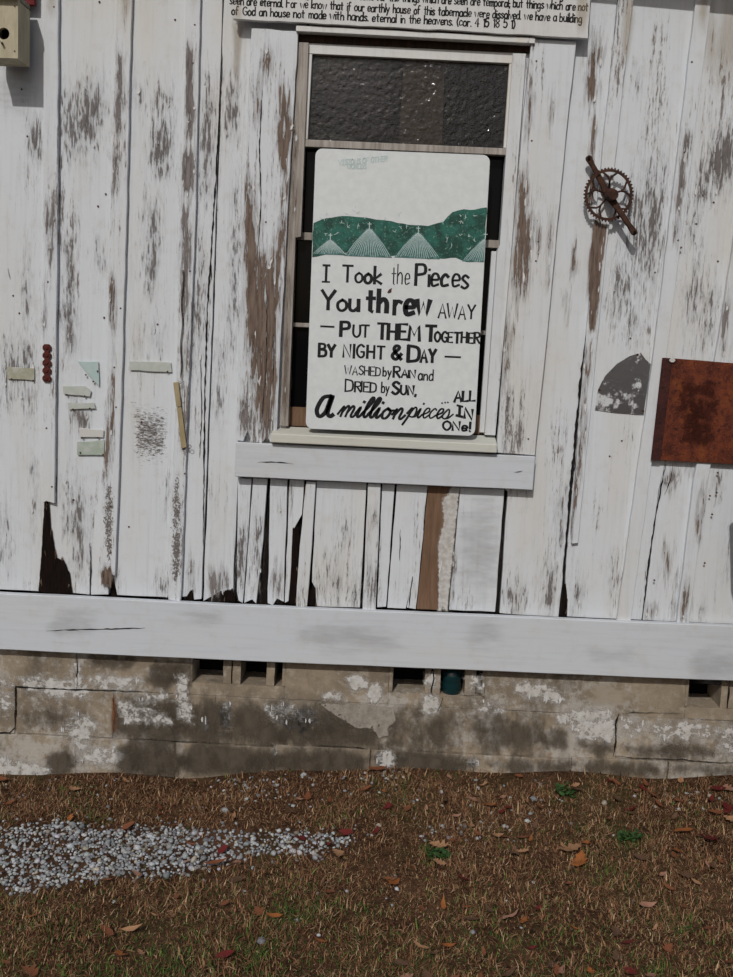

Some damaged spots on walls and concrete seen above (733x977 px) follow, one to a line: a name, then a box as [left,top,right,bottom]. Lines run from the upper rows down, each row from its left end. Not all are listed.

peeling [59,54,125,169]
peeling [586,43,602,102]
peeling [137,41,240,372]
peeling [218,84,297,440]
peeling [510,171,552,301]
peeling [556,125,733,547]
rust [651,358,733,464]
peeling [102,373,115,577]
peeling [155,472,194,597]
leakage [0,656,480,777]
spalling [321,703,396,738]
leakage [469,676,733,776]